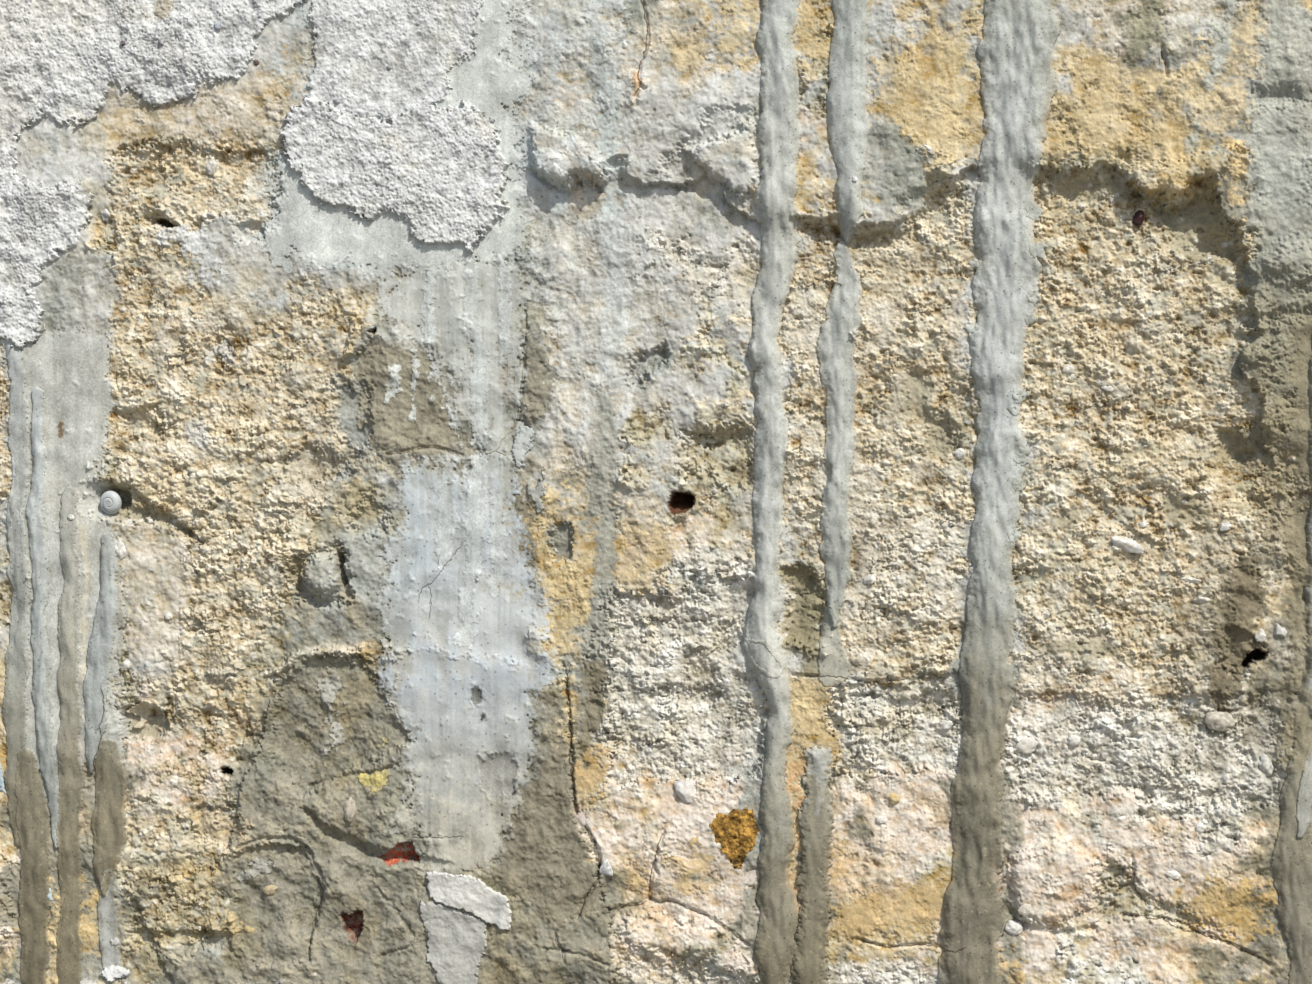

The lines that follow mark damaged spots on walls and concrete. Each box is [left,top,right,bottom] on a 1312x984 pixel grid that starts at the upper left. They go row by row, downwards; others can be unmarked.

damp [0,321,134,774]
spalling [0,0,510,758]
damp [254,0,688,944]
crack [555,670,601,962]
crack [620,832,749,944]
damp [776,561,833,680]
damp [1195,0,1312,776]